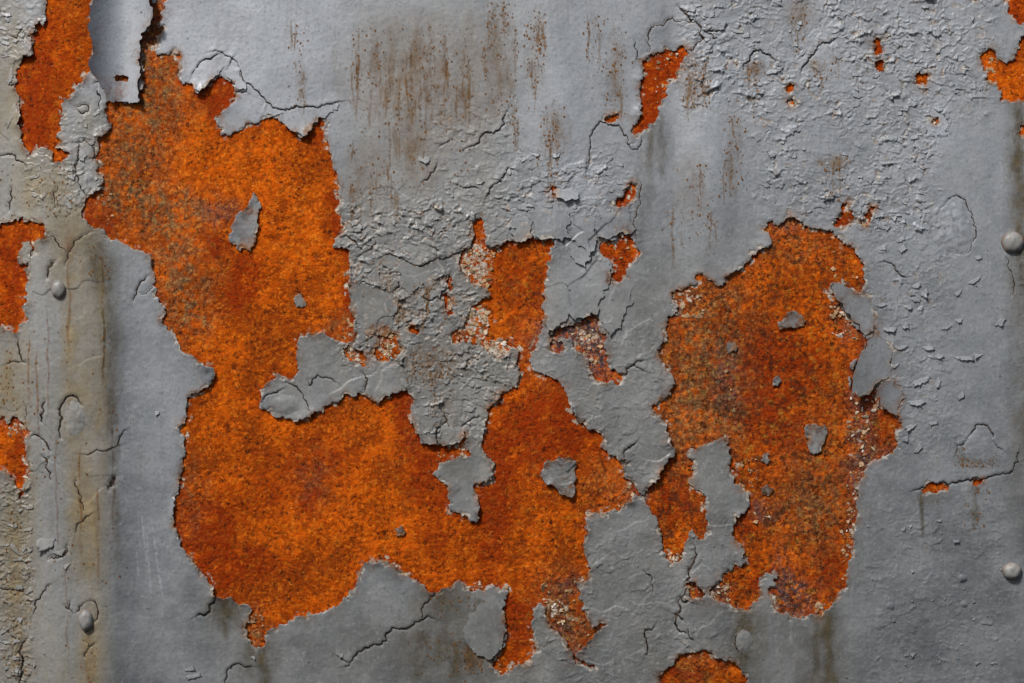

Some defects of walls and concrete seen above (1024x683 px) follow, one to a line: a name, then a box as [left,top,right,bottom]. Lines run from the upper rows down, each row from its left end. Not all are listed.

rust [340,1,565,223]
rust [582,15,633,114]
peeling [834,33,952,141]
crack [940,195,977,254]
rust [353,261,446,344]
peeling [81,0,902,675]
rust [406,346,464,425]
crack [25,395,90,559]
crack [916,424,1020,490]
crack [0,585,48,613]
crack [65,601,99,657]
crack [341,593,435,666]